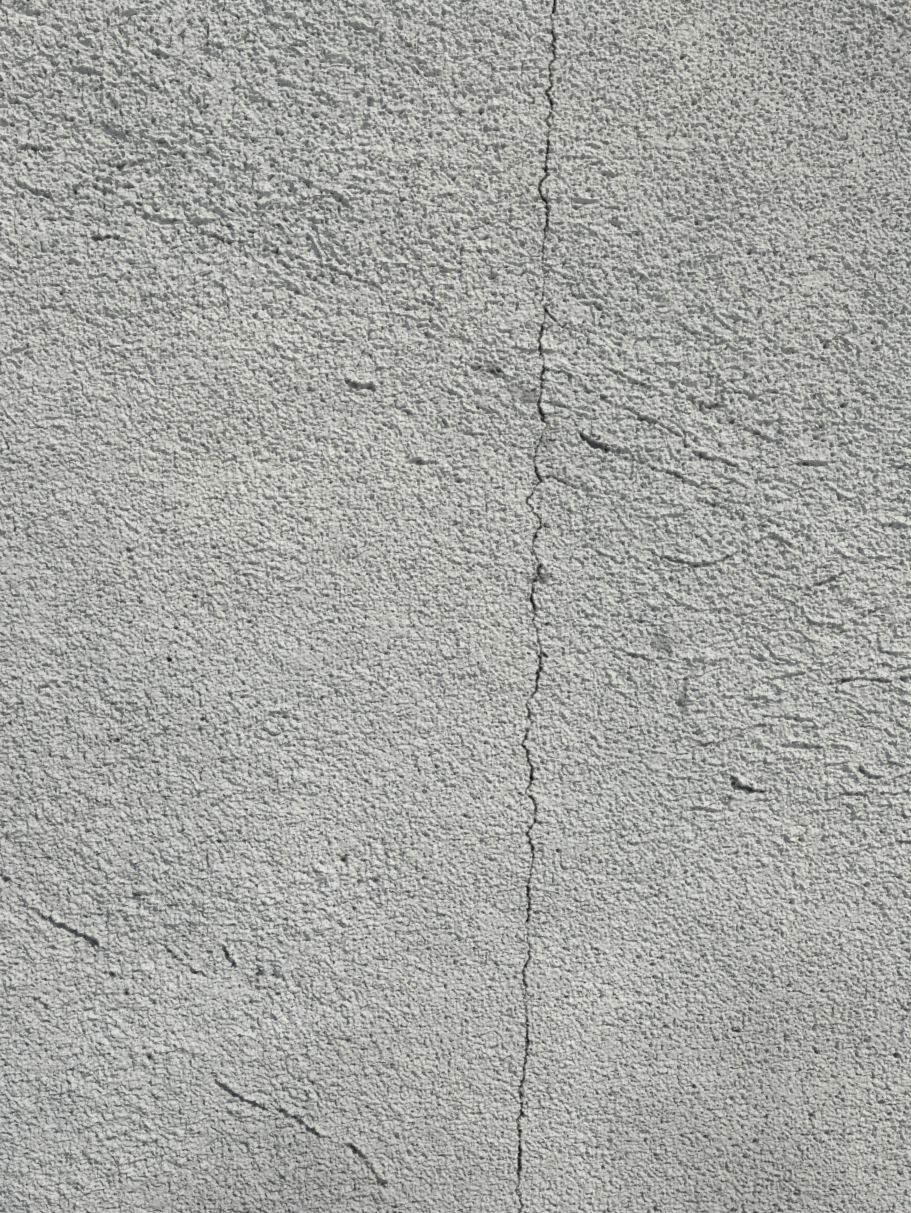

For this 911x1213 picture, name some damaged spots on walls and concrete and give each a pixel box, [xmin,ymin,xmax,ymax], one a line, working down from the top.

crack [510,0,579,1213]